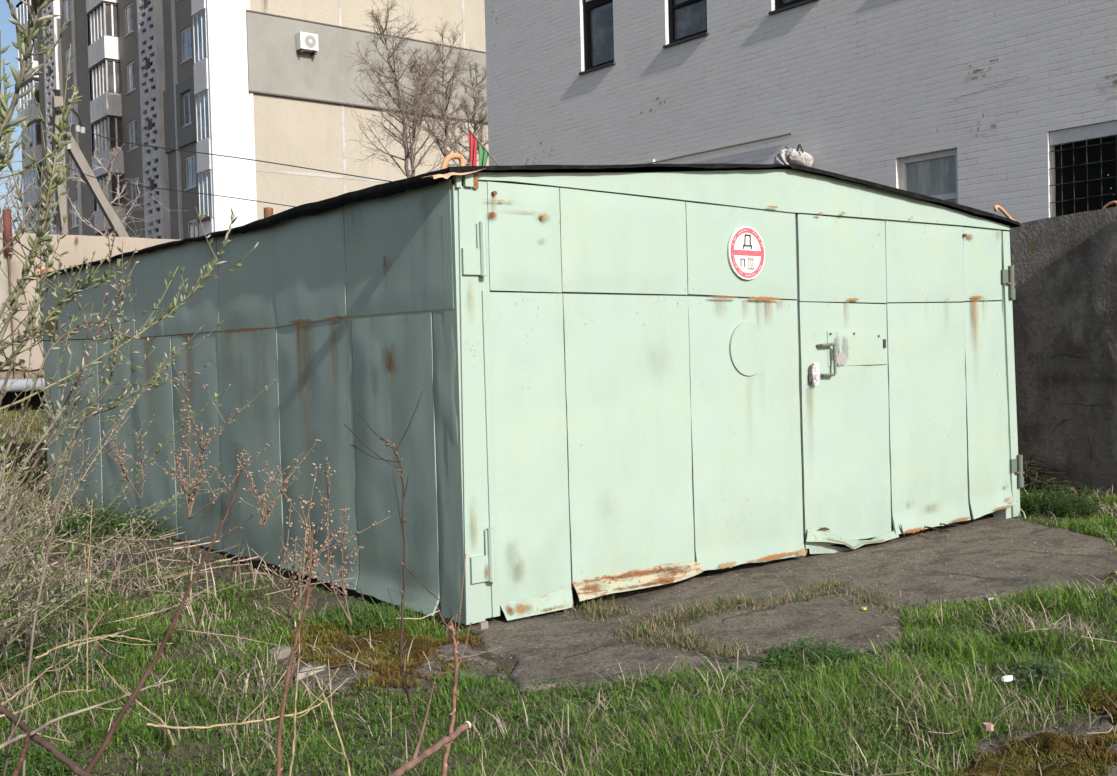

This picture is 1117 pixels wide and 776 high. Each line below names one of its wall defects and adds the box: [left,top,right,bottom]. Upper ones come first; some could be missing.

rust [611,568,682,588]